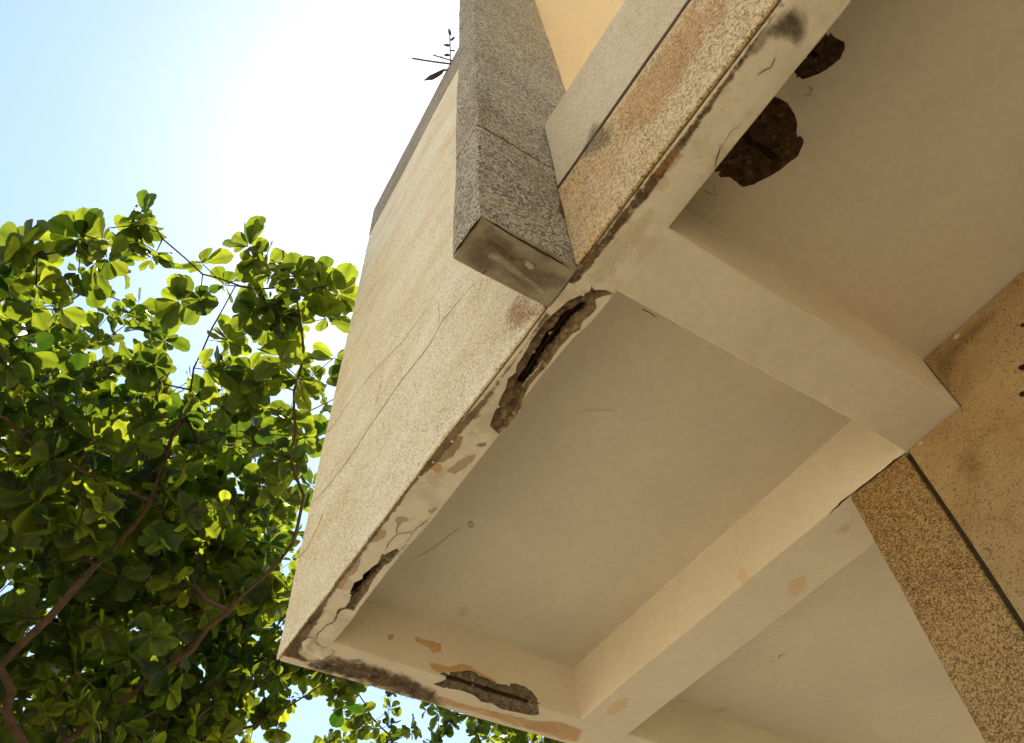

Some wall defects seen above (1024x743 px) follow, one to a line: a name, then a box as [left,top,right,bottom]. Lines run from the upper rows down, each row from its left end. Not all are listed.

spalling [794,32,845,79]
water stain [569,5,803,284]
spalling [714,96,804,187]
spalling [463,286,612,434]
crack [292,271,487,564]
water stain [283,351,522,705]
spalling [333,549,400,615]
crack [300,611,339,659]
spalling [415,637,540,716]